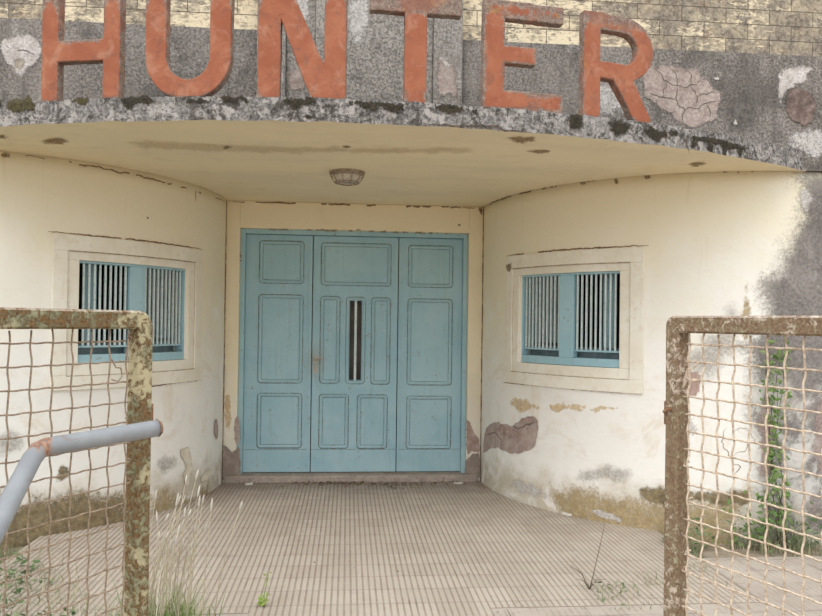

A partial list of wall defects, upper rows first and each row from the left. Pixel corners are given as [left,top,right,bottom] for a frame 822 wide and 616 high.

spalling [0,34,42,76]
spalling [778,65,817,126]
water stain [691,136,749,156]
water stain [761,173,822,316]
spalling [214,395,253,485]
spalling [454,398,538,484]
peeling [550,403,613,412]
water stain [743,334,822,546]